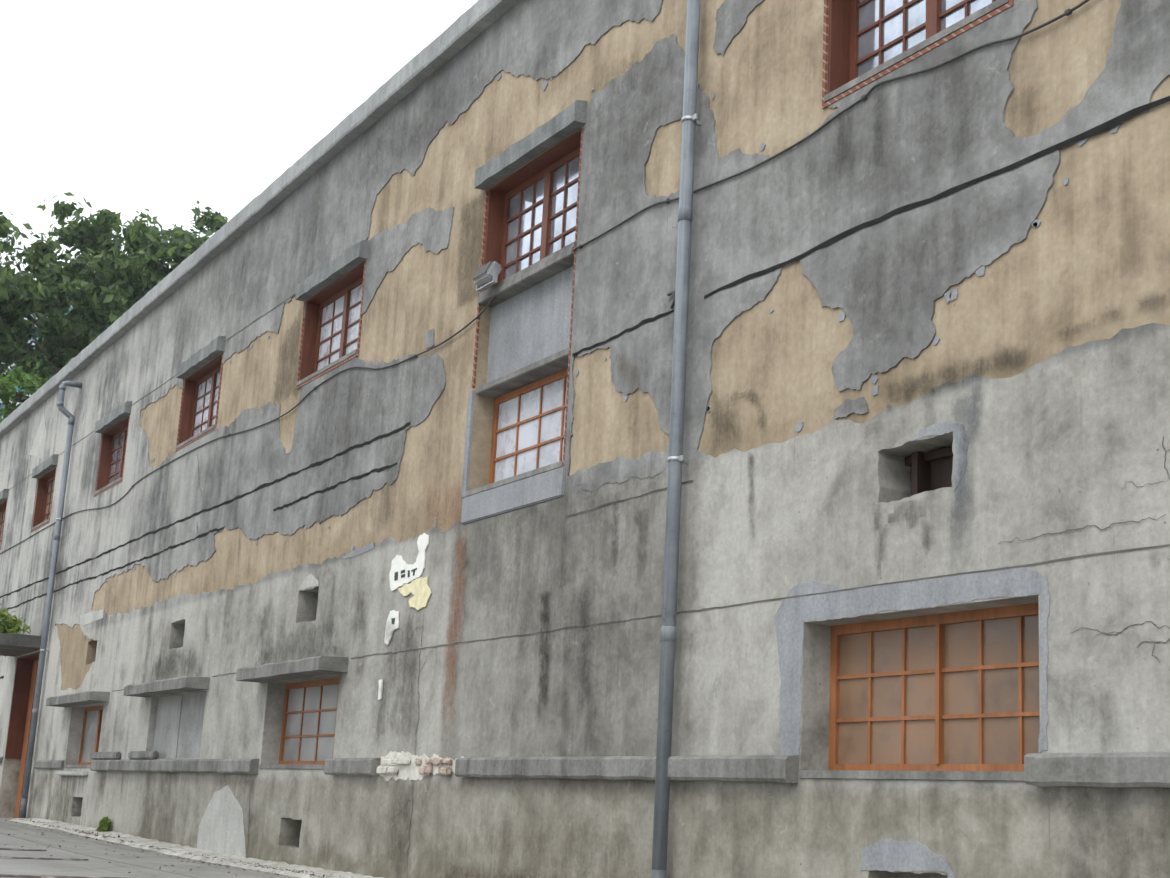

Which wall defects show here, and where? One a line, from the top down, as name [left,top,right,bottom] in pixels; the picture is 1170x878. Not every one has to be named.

peeling [1004,0,1122,138]
peeling [698,76,1170,458]
peeling [92,0,839,645]
crack [1121,437,1170,490]
crack [998,514,1166,544]
peeling [56,623,97,691]
crack [1071,621,1170,662]
peeling [376,758,452,776]